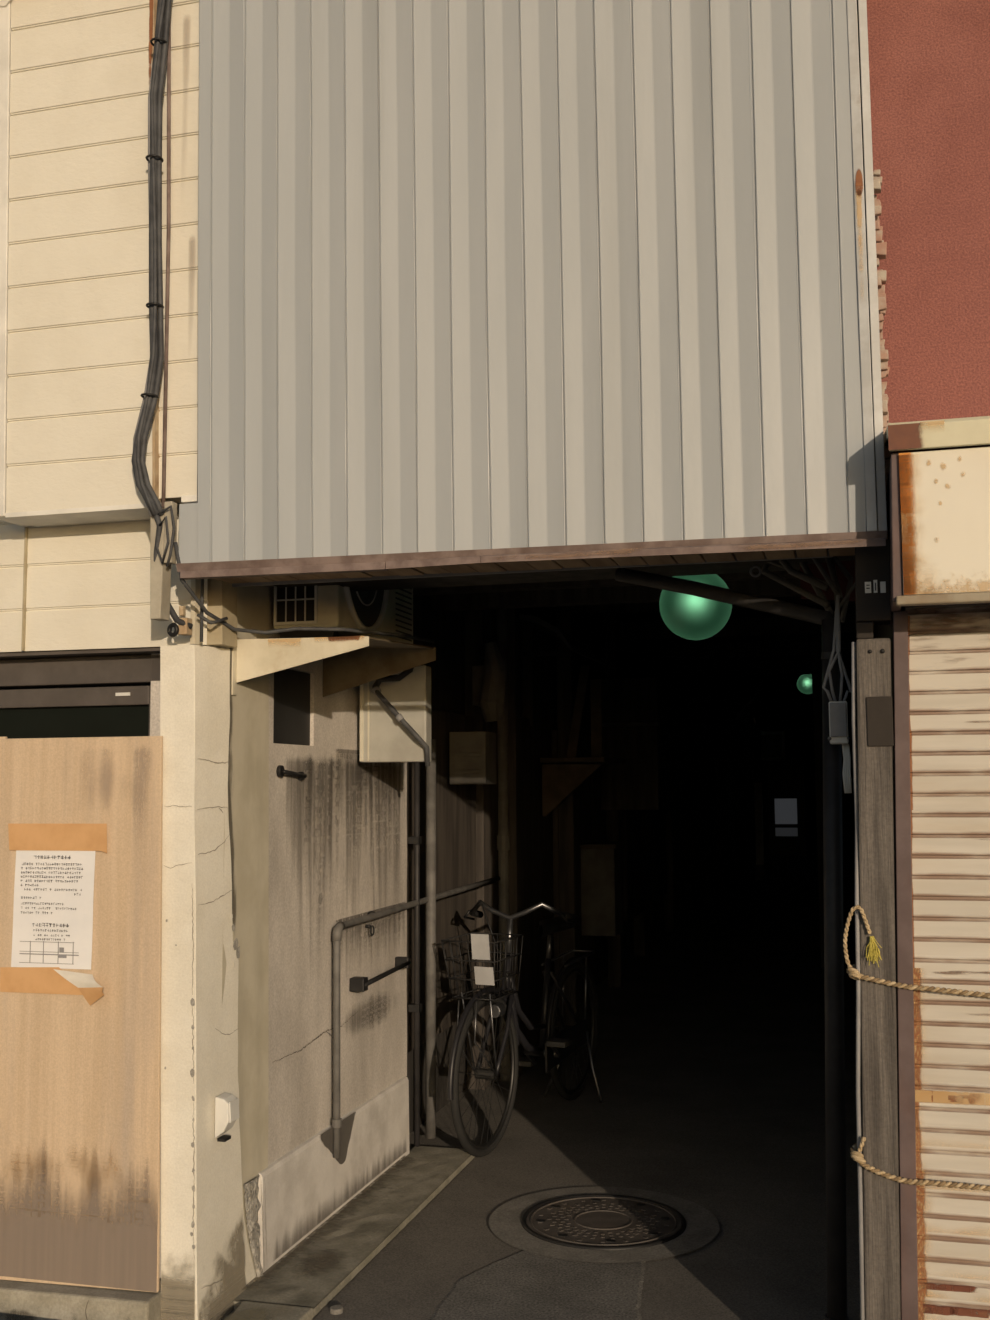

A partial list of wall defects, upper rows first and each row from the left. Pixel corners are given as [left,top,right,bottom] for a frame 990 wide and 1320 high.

rust [855,169,863,226]
rust [888,420,990,655]
water stain [297,749,400,848]
rust [912,884,990,1320]
water stain [0,1151,413,1320]